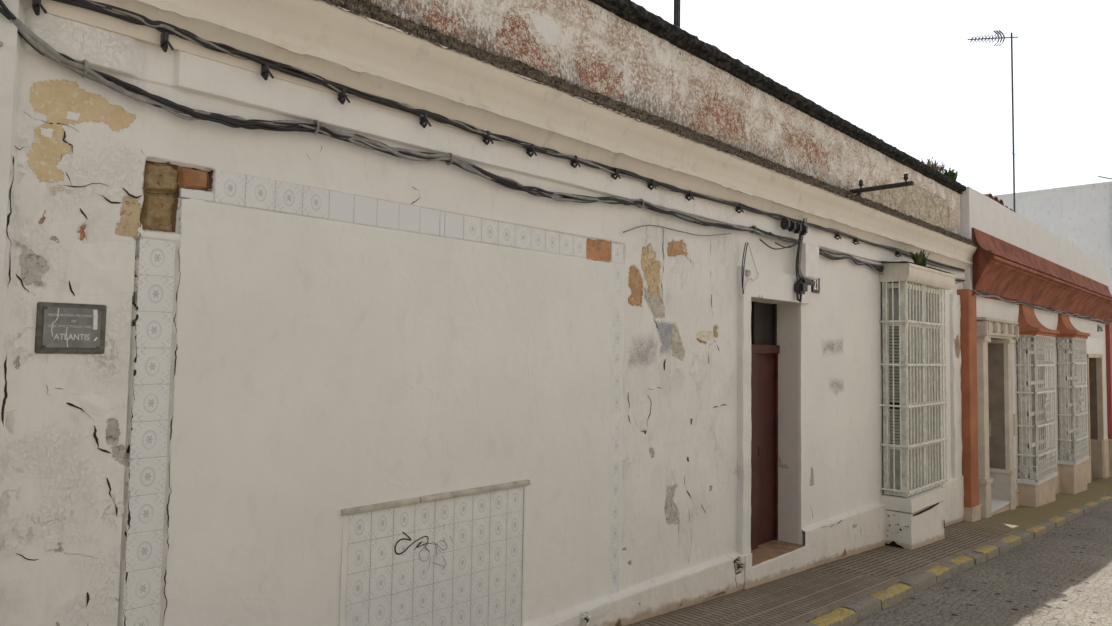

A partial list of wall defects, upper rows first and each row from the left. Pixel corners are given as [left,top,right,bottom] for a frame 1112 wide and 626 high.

crack [6,146,37,292]
peeling [27,79,136,193]
crack [26,113,142,219]
peeling [116,157,214,239]
flaking render [628,240,689,361]
peeling [696,325,718,344]
crack [1,352,15,426]
flaking render [106,419,132,467]
flaking render [665,484,680,525]